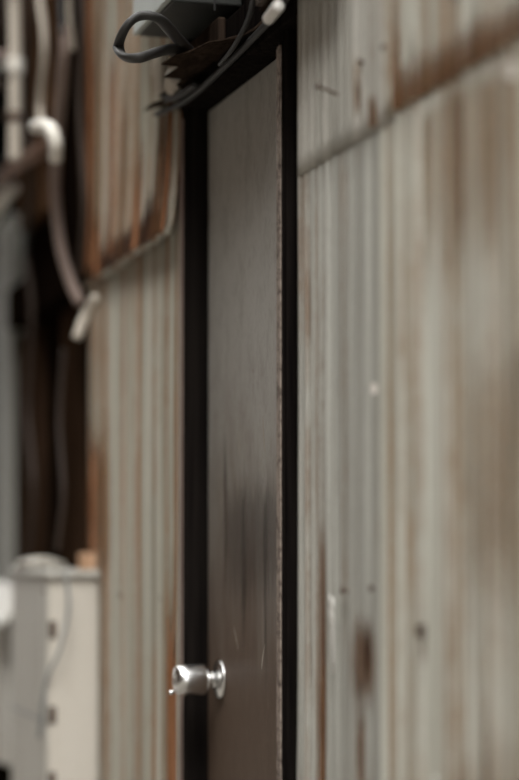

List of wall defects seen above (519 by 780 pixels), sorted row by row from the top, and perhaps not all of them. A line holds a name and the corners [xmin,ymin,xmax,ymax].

corrosion [392,6,519,109]
corrosion [356,631,373,695]